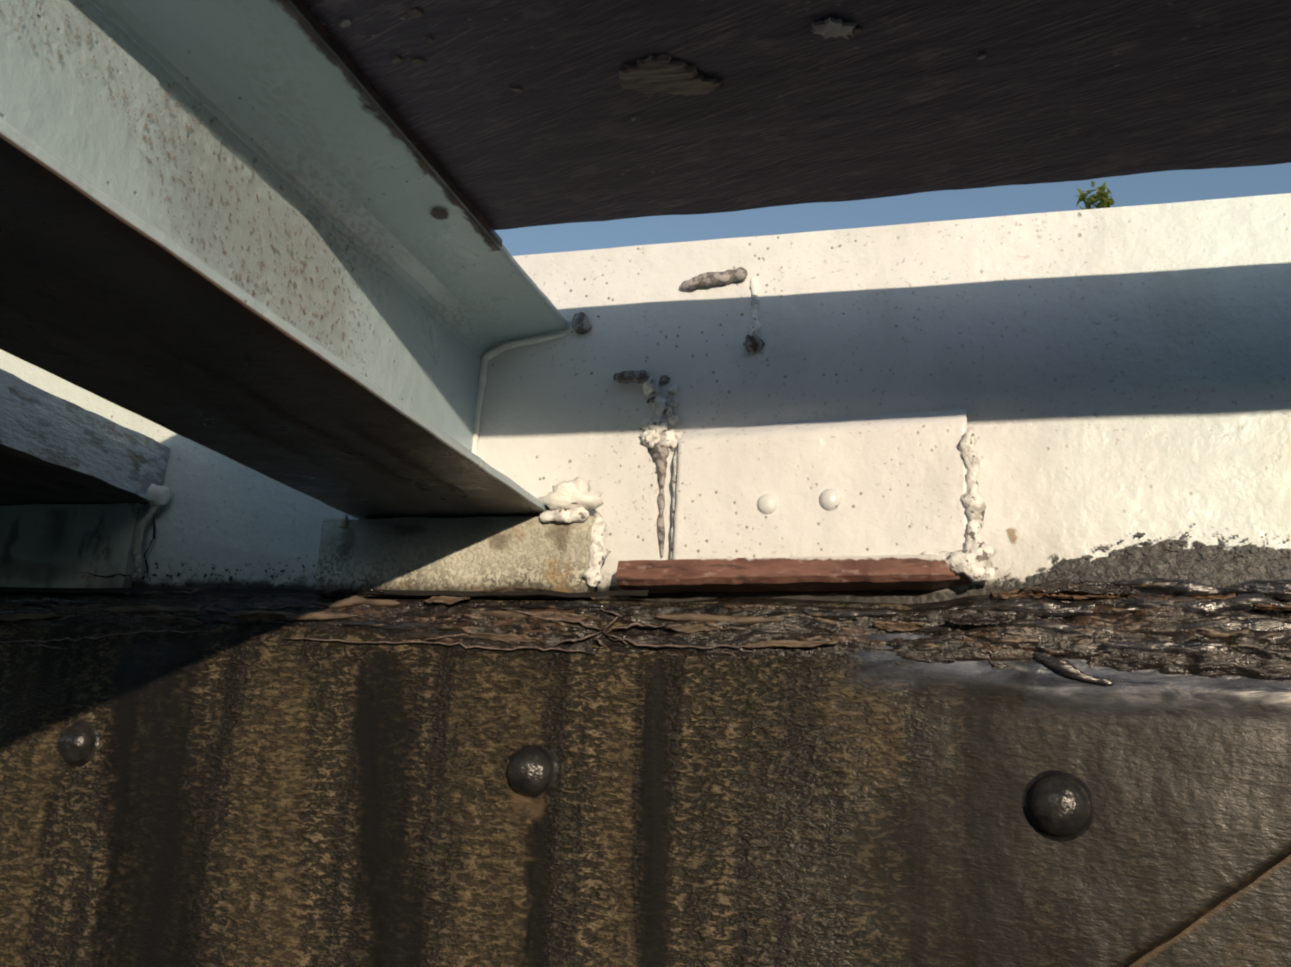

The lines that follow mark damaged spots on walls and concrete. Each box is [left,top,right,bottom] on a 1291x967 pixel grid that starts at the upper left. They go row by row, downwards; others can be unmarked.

corrosion [275,0,502,252]
spalling [618,54,725,97]
peeling [811,17,857,39]
crack [285,608,761,654]
damp [358,652,421,967]
damp [522,810,547,967]
damp [643,662,668,967]